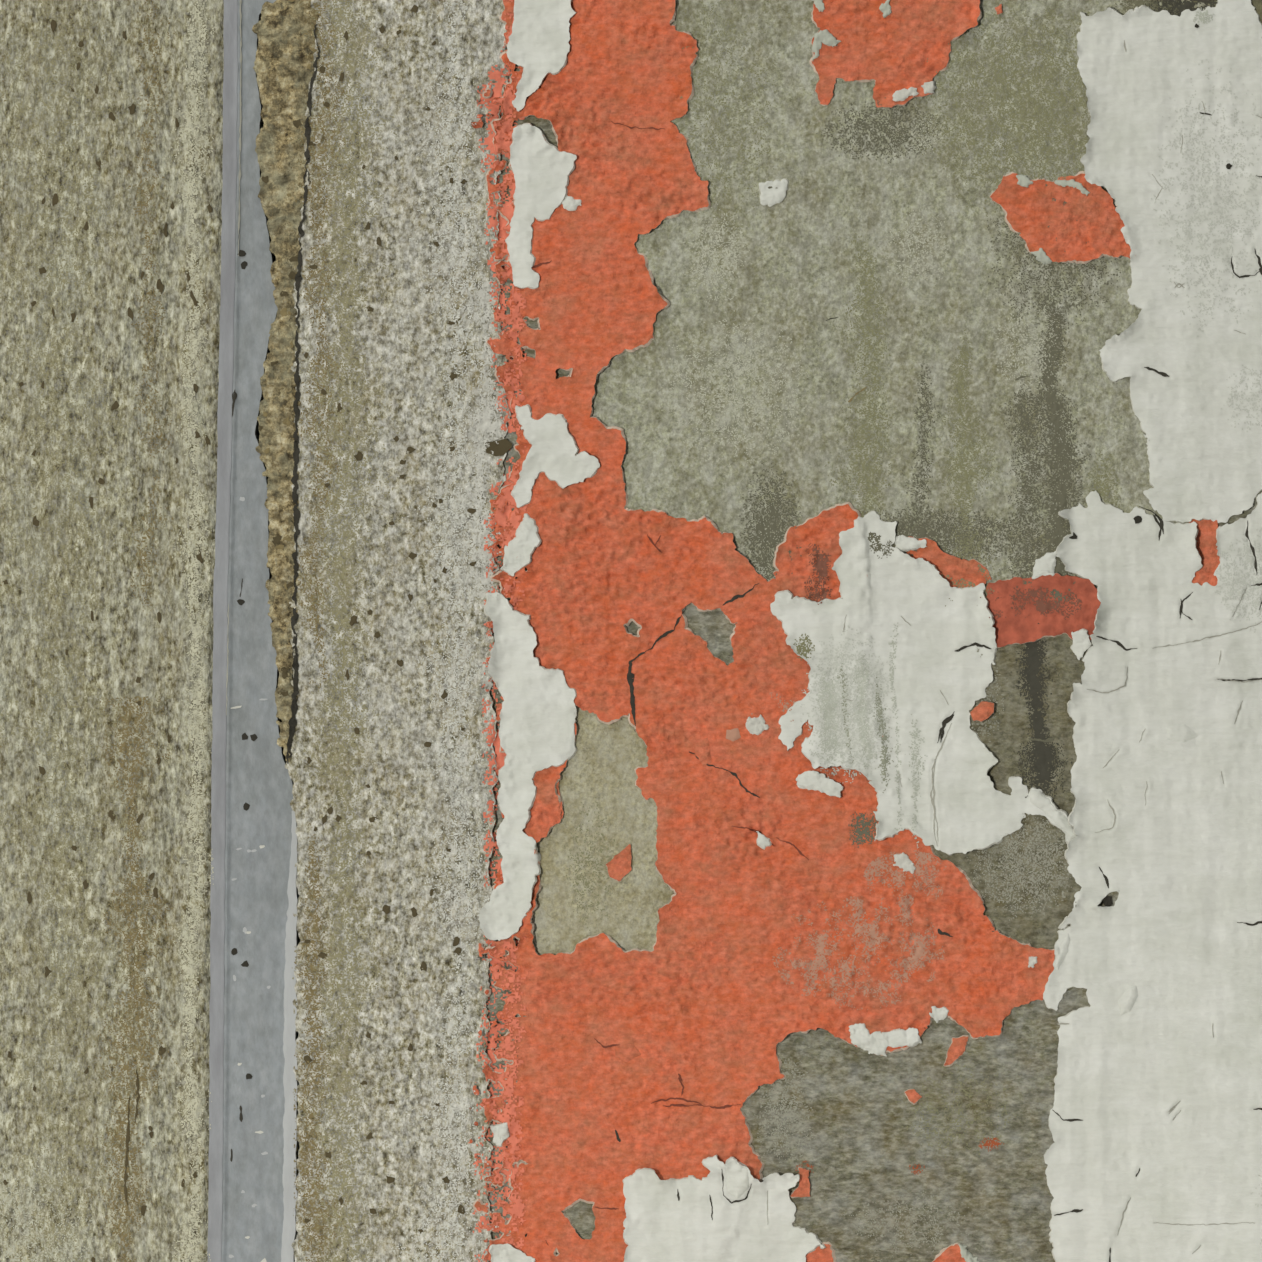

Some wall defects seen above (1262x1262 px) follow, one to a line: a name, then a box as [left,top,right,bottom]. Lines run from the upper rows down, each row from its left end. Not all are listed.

leakage [1107,0,1217,25]
peeling [1251,0,1262,23]
crack [286,24,320,764]
peeling [591,0,1217,584]
leakage [816,7,1122,606]
crack [627,609,686,731]
leakage [970,623,1072,798]
crack [1139,506,1164,540]
crack [1087,520,1262,724]
peeling [532,706,674,955]
leakage [966,814,1076,921]
peeling [742,987,1090,1262]